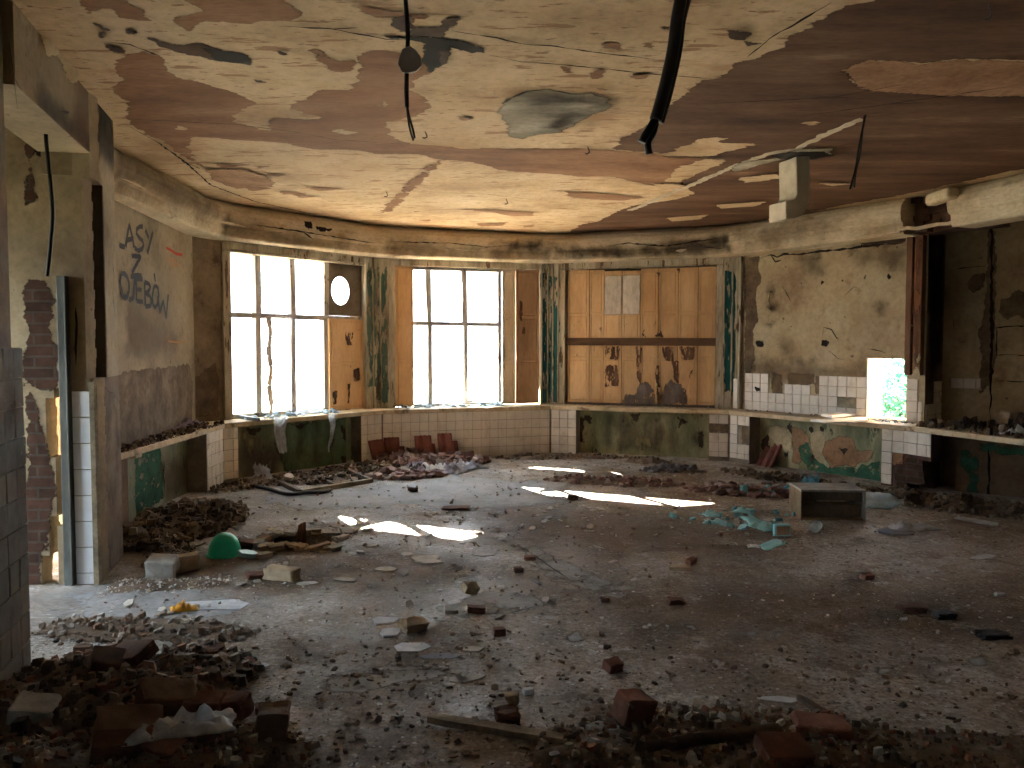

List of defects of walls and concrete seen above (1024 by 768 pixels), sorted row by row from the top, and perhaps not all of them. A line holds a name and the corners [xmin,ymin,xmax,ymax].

crack [750,2,832,55]
leakage [497,89,611,139]
flaking render [23,144,41,205]
peeling [79,0,1024,404]
leakage [495,236,728,258]
crack [958,229,1024,419]
flaking render [22,279,59,585]
spalling [104,363,219,570]
peeling [580,415,592,442]
peeling [605,330,695,428]
peeling [698,423,881,481]
peeling [837,397,860,411]